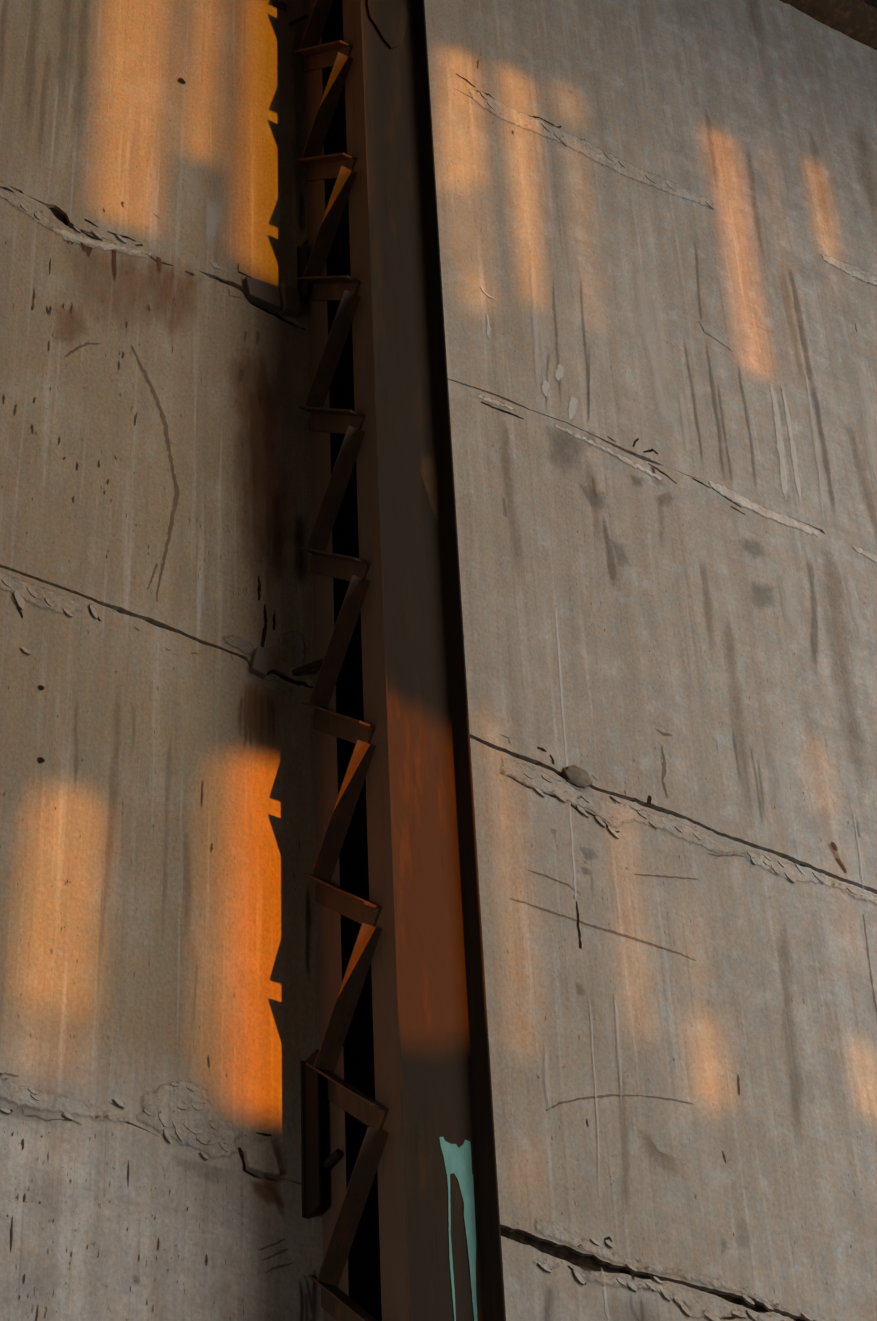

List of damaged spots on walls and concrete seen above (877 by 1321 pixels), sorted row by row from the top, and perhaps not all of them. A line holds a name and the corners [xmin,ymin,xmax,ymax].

crack [41,207,306,330]
crack [481,401,524,419]
crack [607,436,745,515]
crack [257,576,314,688]
crack [501,735,620,833]
crack [624,729,671,814]
crack [635,840,742,880]
crack [512,871,695,961]
crack [863,889,877,1014]
crack [238,1132,278,1181]
crack [500,1228,654,1285]
crack [684,1289,806,1321]